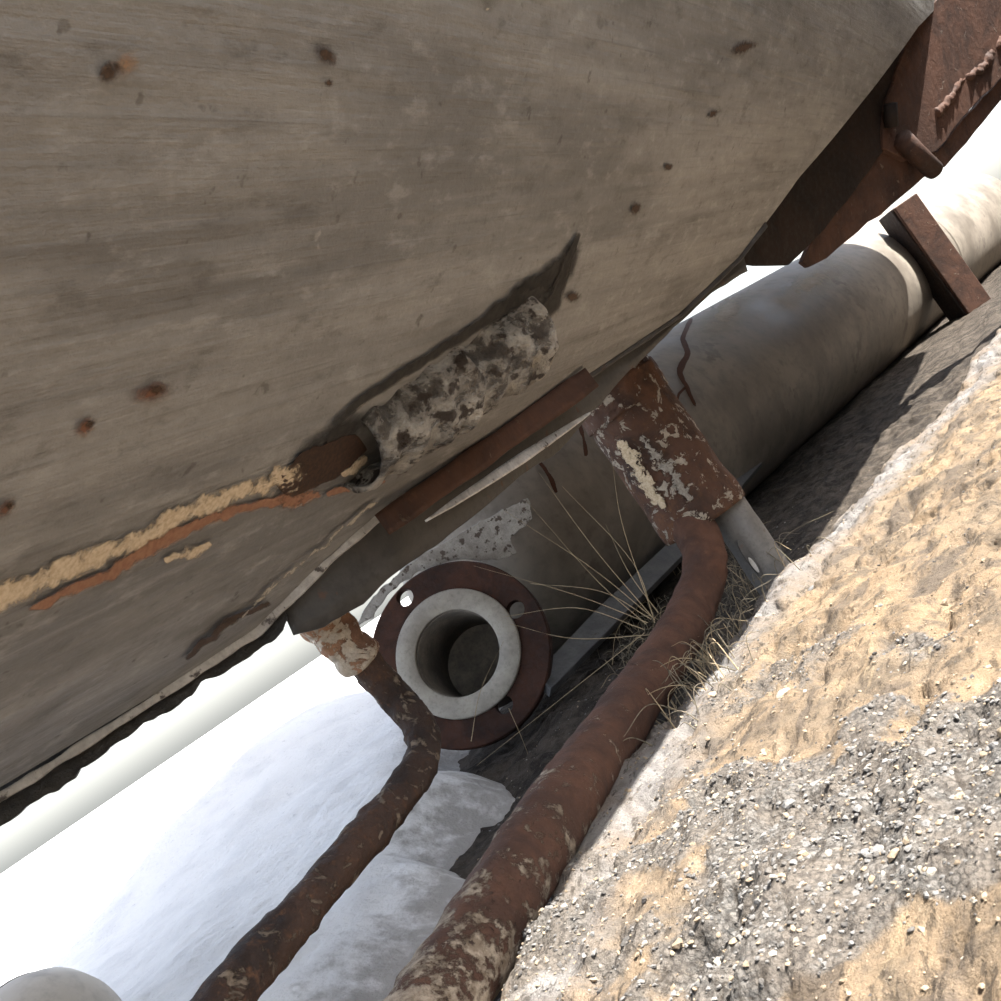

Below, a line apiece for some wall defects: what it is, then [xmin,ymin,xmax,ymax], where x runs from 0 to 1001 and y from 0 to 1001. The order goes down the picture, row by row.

corrosion [99,57,133,81]
corrosion [78,419,94,434]
corrosion [137,385,166,401]
peeling [617,435,698,516]
peeling [0,455,368,611]
peeling [186,502,378,660]